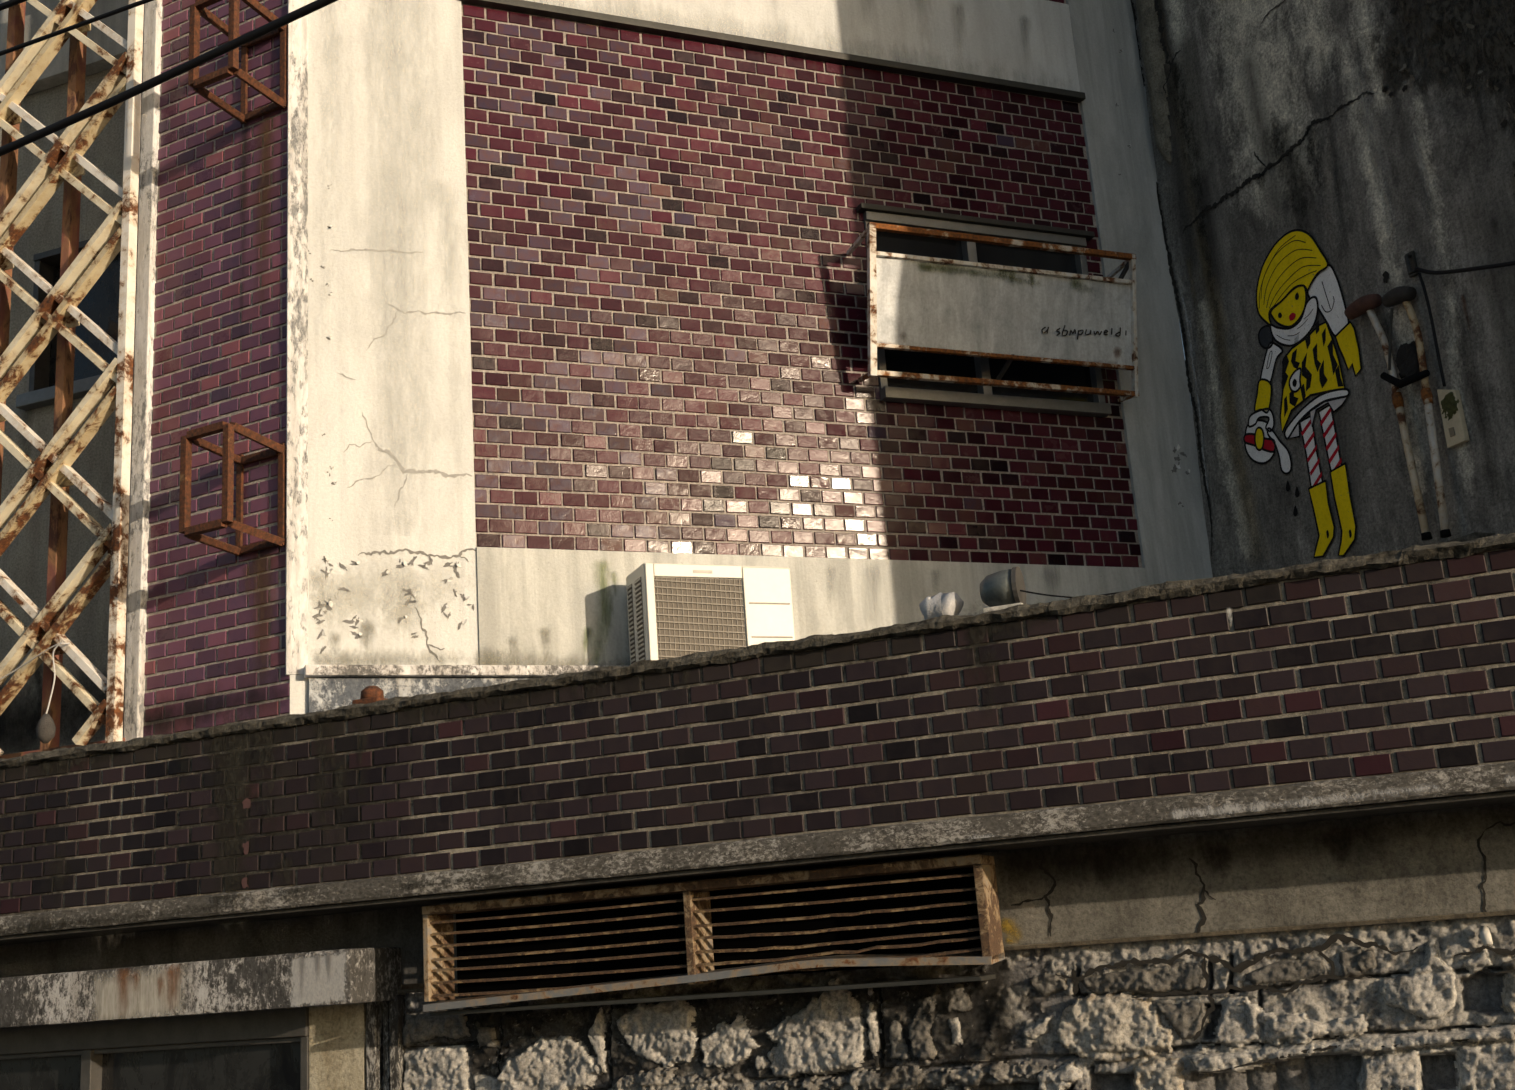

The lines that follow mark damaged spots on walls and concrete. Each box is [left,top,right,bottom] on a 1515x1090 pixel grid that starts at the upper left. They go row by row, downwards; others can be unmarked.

crack [1182,91,1375,234]
crack [338,303,472,506]
peeling [312,556,363,654]
peeling [398,588,419,638]
peeling [382,555,474,630]
crack [1011,856,1056,937]
crack [1454,821,1515,956]
crack [1055,858,1469,1073]